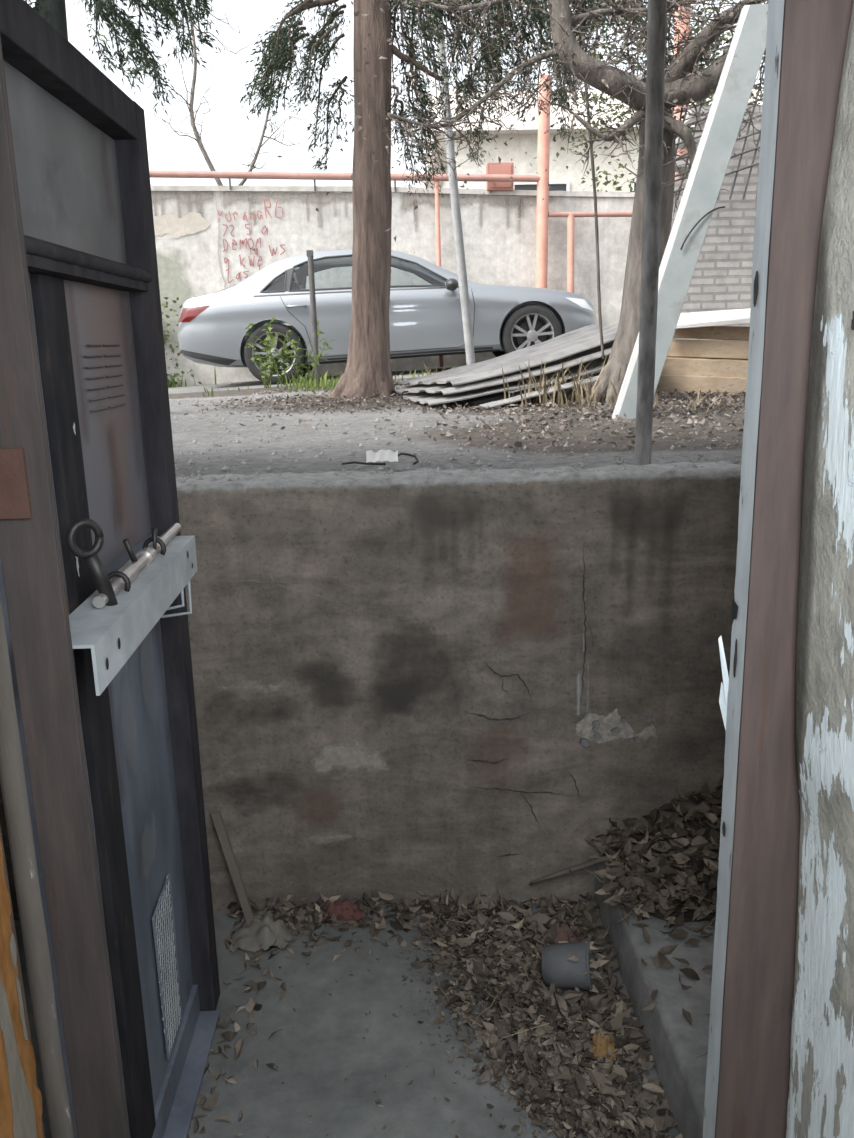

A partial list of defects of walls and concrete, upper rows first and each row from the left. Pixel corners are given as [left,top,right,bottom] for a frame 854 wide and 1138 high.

peeling [820,311,854,569]
crack [581,548,593,705]
peeling [831,582,854,668]
crack [470,758,579,829]
spalling [575,708,658,747]
peeling [786,691,854,1138]